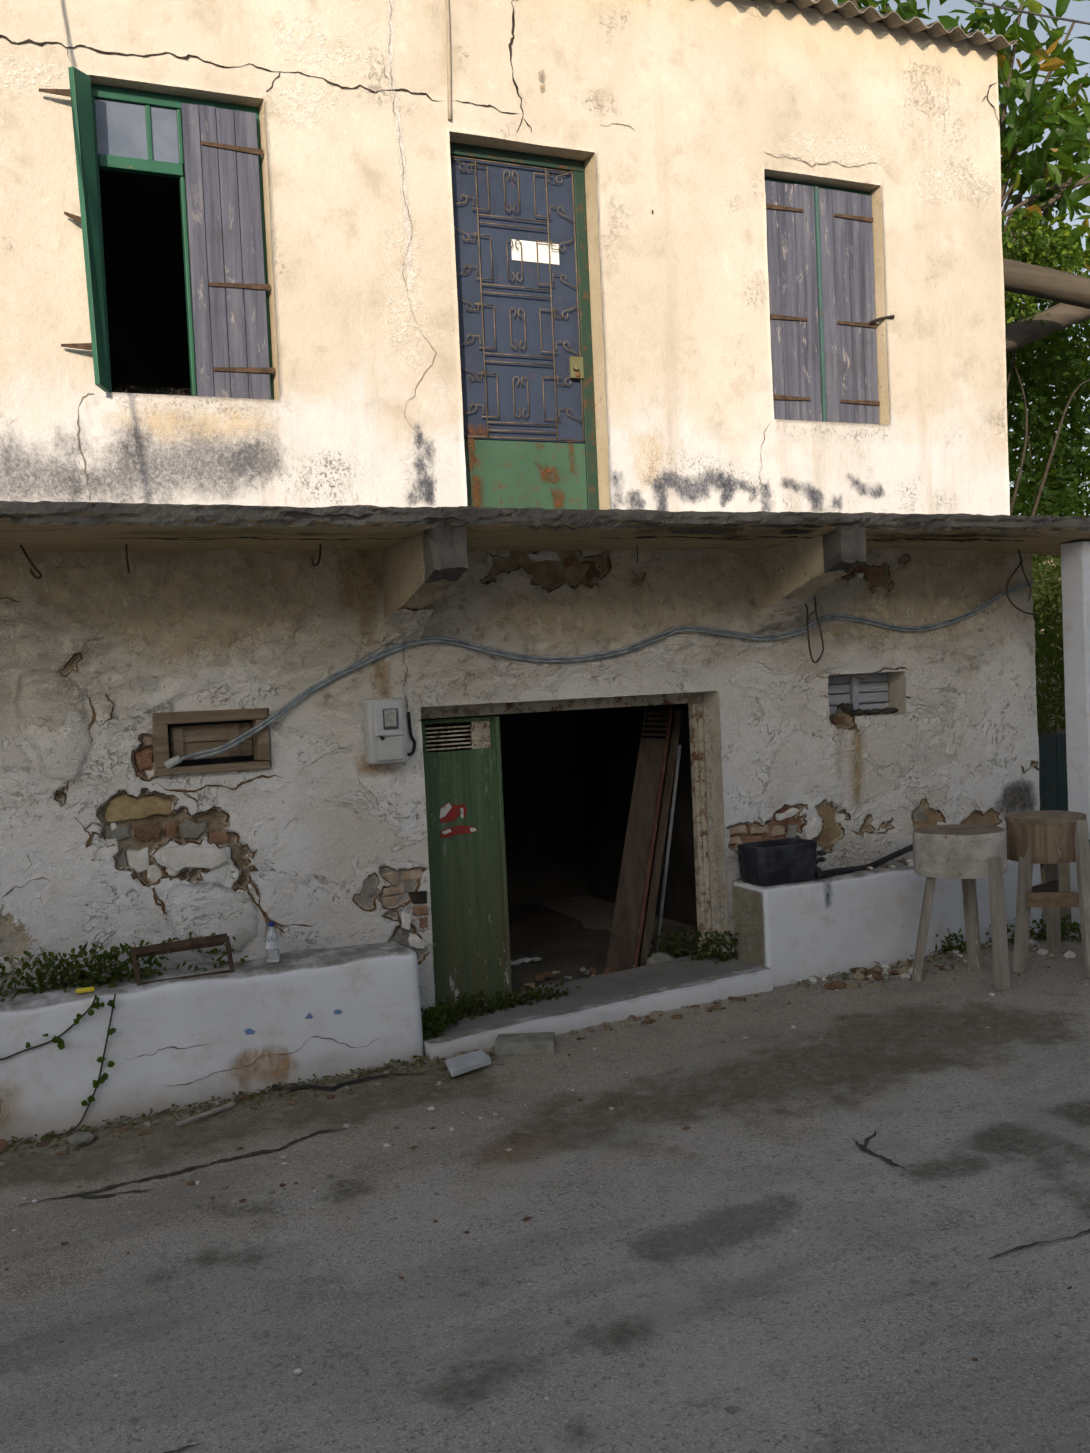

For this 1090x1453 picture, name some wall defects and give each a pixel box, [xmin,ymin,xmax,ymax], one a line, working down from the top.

crack [0,0,532,433]
damp [0,431,276,503]
damp [408,426,433,503]
corrosion [467,426,487,507]
corrosion [539,444,574,508]
damp [613,458,841,511]
flaking render [479,550,612,593]
flaking render [96,733,258,891]
flaking render [703,692,1003,967]
flaking render [352,866,430,965]
crack [19,1128,347,1206]
crack [988,1229,1090,1260]